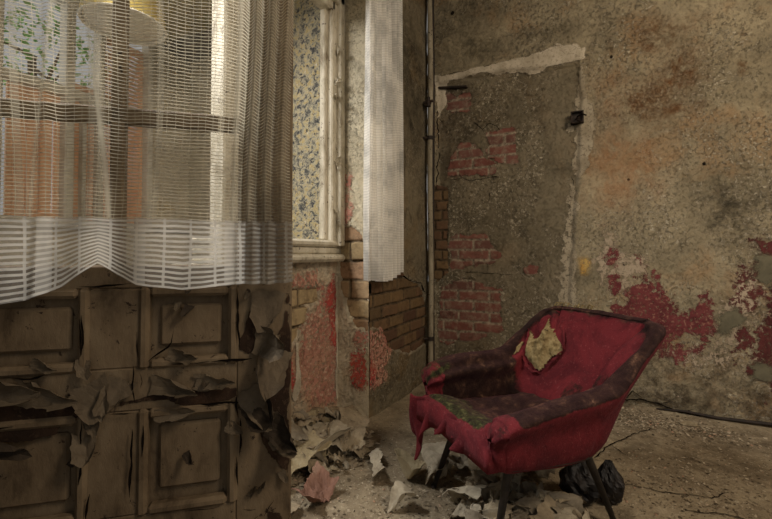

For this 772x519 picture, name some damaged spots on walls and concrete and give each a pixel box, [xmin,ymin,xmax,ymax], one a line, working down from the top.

flaking render [434,43,597,307]
peeling [0,172,427,485]
peeling [588,214,772,406]
peeling [128,426,144,497]